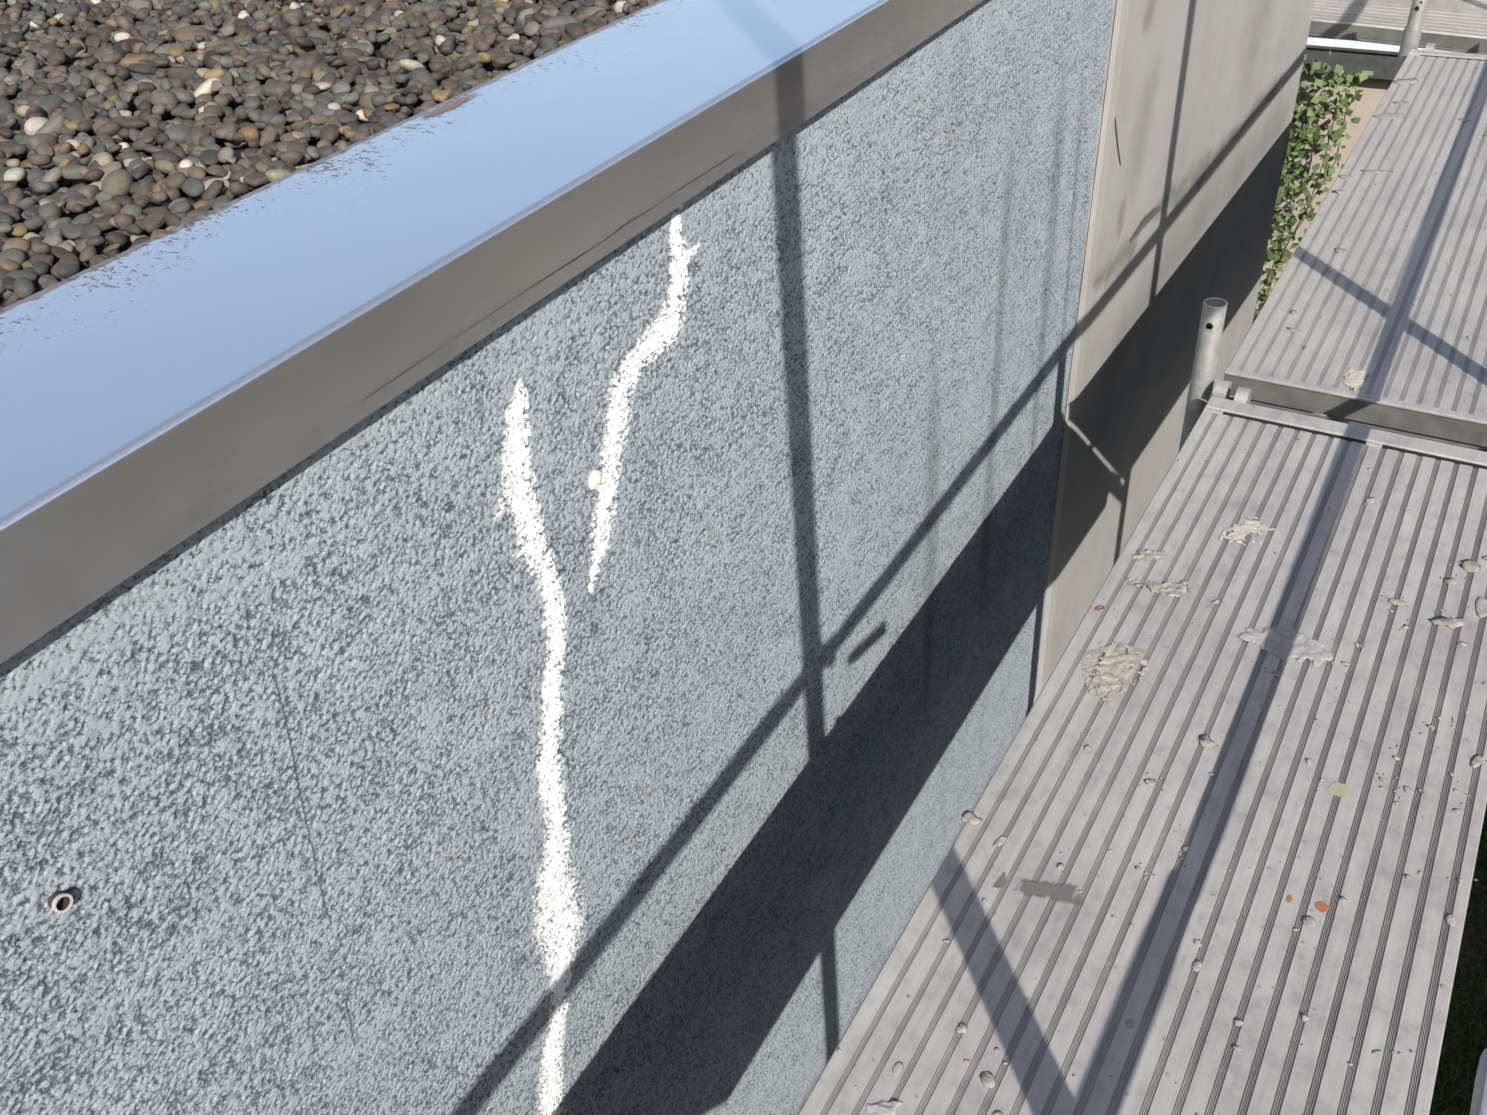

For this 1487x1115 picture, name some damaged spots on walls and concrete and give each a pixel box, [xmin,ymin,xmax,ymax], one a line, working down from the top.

crack [493,204,700,1115]